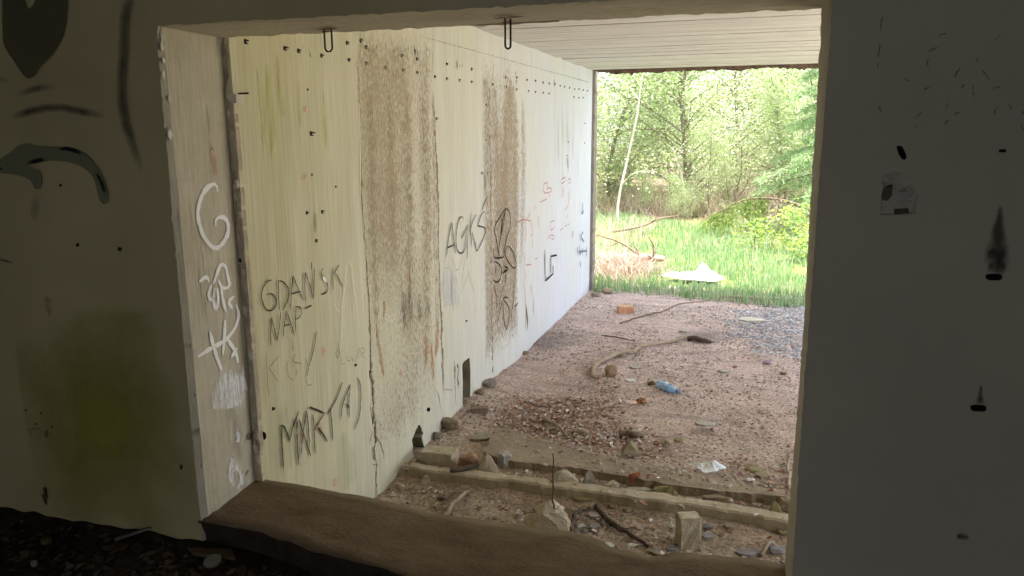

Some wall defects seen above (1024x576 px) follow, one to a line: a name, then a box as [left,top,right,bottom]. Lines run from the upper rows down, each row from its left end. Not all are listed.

crack [357,64,384,495]
water stain [388,91,450,345]